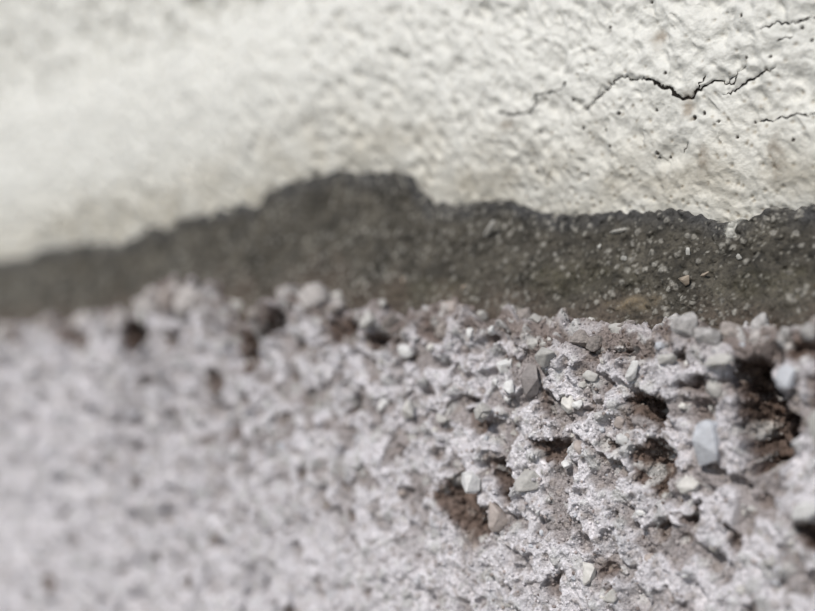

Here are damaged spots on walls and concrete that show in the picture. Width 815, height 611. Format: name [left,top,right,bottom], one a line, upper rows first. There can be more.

crack [586,66,775,110]
spalling [49,322,90,351]
spalling [115,316,185,357]
spalling [202,304,289,402]
spalling [327,299,460,358]
spalling [237,390,253,409]